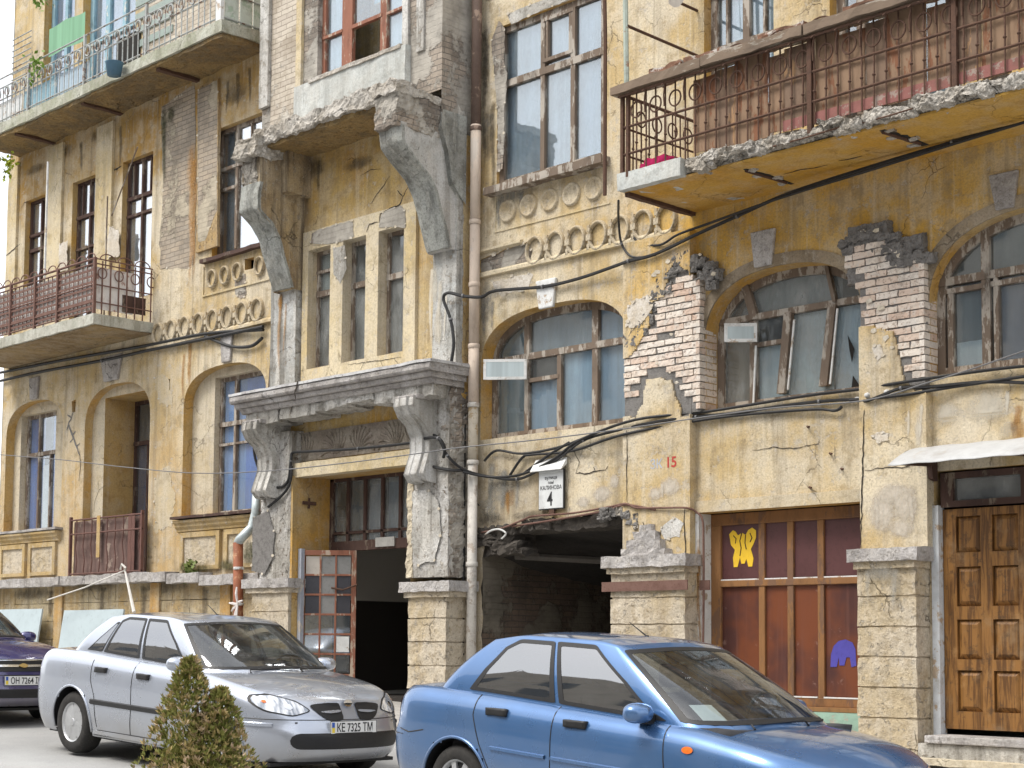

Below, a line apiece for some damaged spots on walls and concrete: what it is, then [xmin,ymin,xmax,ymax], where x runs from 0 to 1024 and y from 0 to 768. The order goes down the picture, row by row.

spalling [159,80,219,269]
spalling [231,77,442,186]
spalling [378,206,406,228]
spalling [684,71,1024,186]
spalling [622,250,725,412]
spalling [837,225,938,378]
crack [67,413,100,509]
spalling [405,386,564,578]
peeling [660,516,683,540]
crack [860,414,909,545]